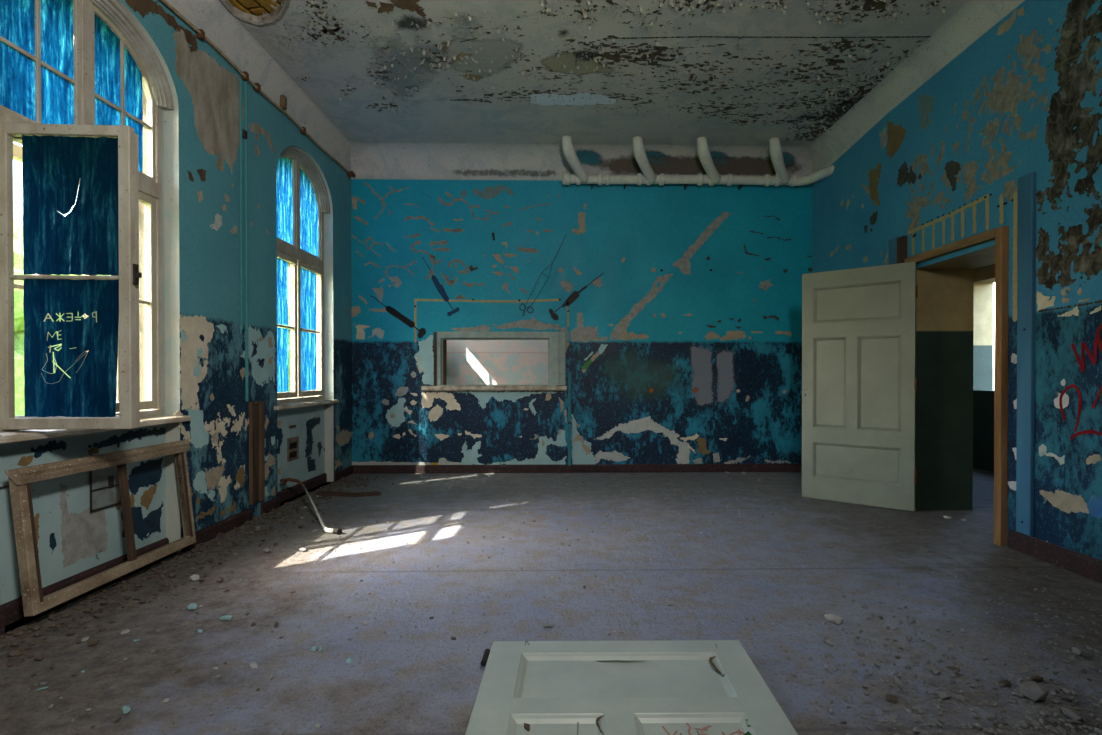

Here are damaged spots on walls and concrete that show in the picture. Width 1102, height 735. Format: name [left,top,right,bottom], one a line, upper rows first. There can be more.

leakage [397,15,428,30]
leakage [442,39,521,81]
leakage [542,50,612,75]
peeling [245,0,929,142]
leakage [801,93,866,122]
peeling [840,0,1102,316]
peeling [672,212,732,275]
spalling [451,312,648,373]
peeling [88,314,276,522]
peeling [305,417,352,472]
peeling [335,335,750,470]
peeling [1039,444,1065,465]